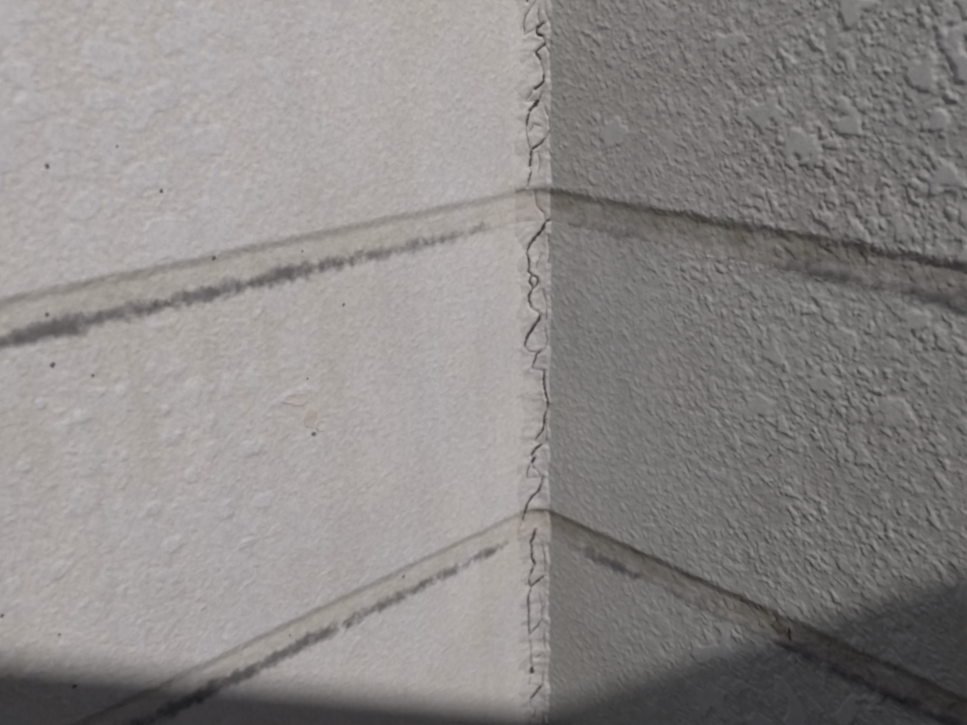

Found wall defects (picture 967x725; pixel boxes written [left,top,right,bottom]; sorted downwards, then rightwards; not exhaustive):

crack [521,0,551,725]